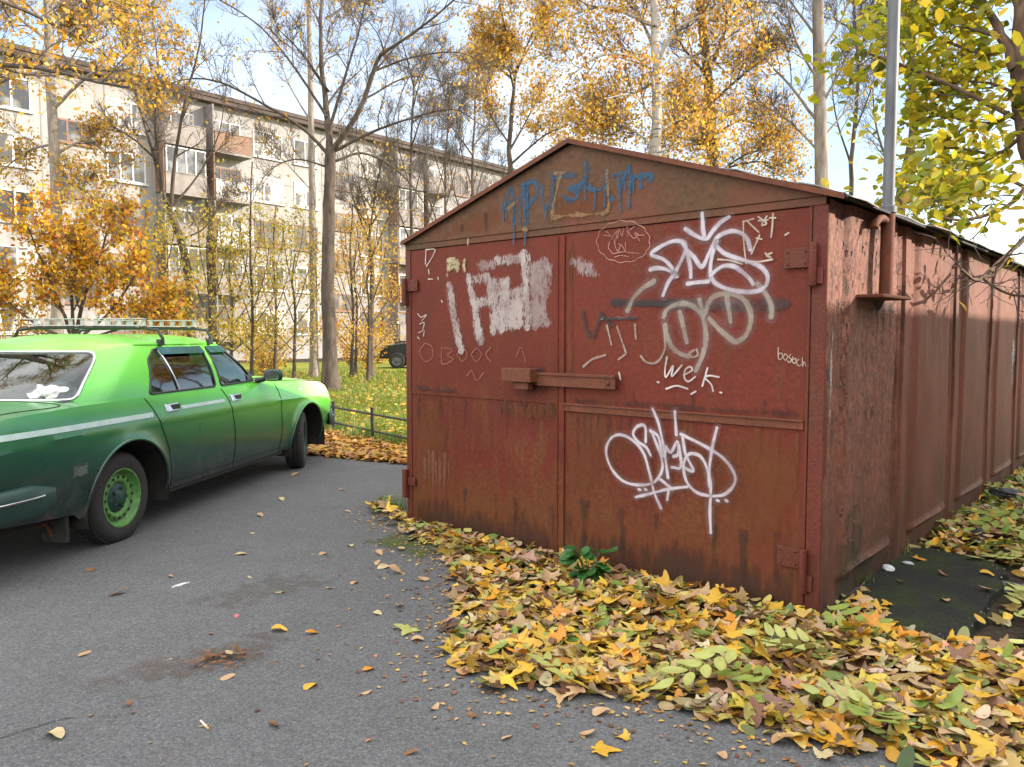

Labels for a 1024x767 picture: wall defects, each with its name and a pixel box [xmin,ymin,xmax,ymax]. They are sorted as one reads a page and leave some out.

corrosion [873,289,905,329]